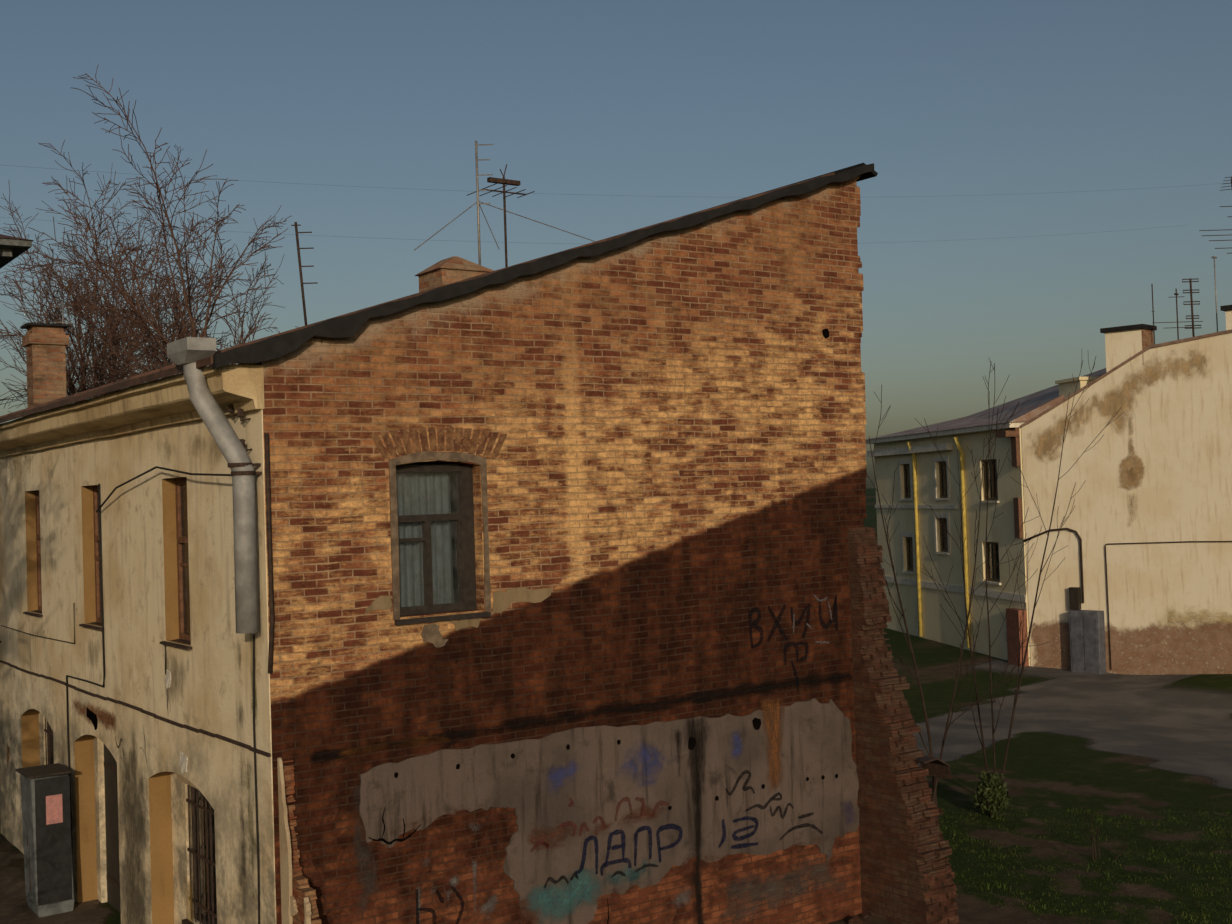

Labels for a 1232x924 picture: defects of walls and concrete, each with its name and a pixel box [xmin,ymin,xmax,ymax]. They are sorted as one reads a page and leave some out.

damp [1034,354,1206,460]
flaking render [359,698,860,924]